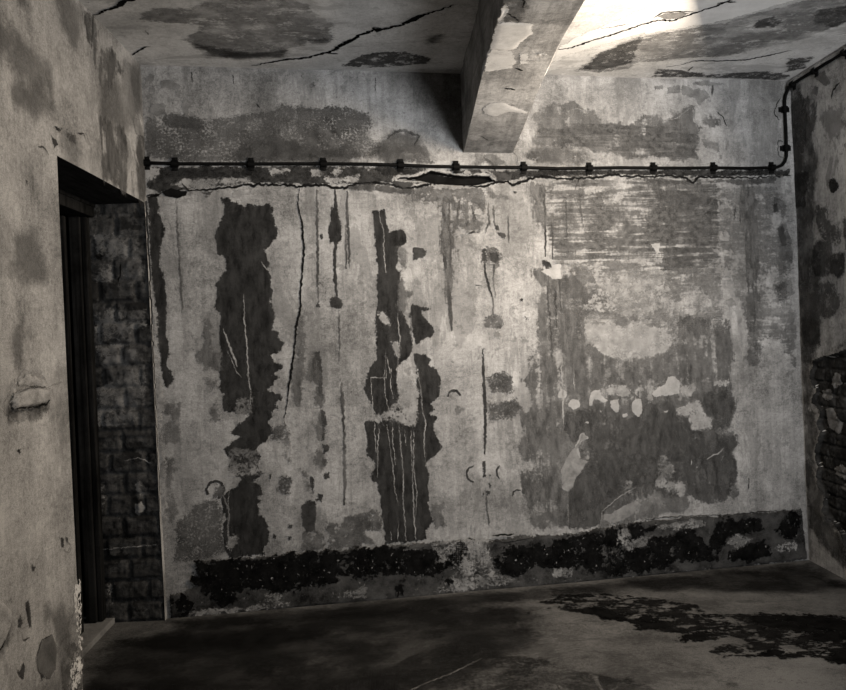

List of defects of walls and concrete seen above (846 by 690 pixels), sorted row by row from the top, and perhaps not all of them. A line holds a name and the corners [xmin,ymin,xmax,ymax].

crack [94,0,135,15]
crack [251,5,452,66]
crack [557,0,735,50]
peeling [791,71,840,153]
water stain [62,0,435,388]
peeling [829,178,839,195]
water stain [88,87,846,690]
crack [146,173,790,495]
peeling [145,165,798,530]
spalling [809,349,846,548]
peeling [586,456,739,550]
peeling [433,538,503,593]